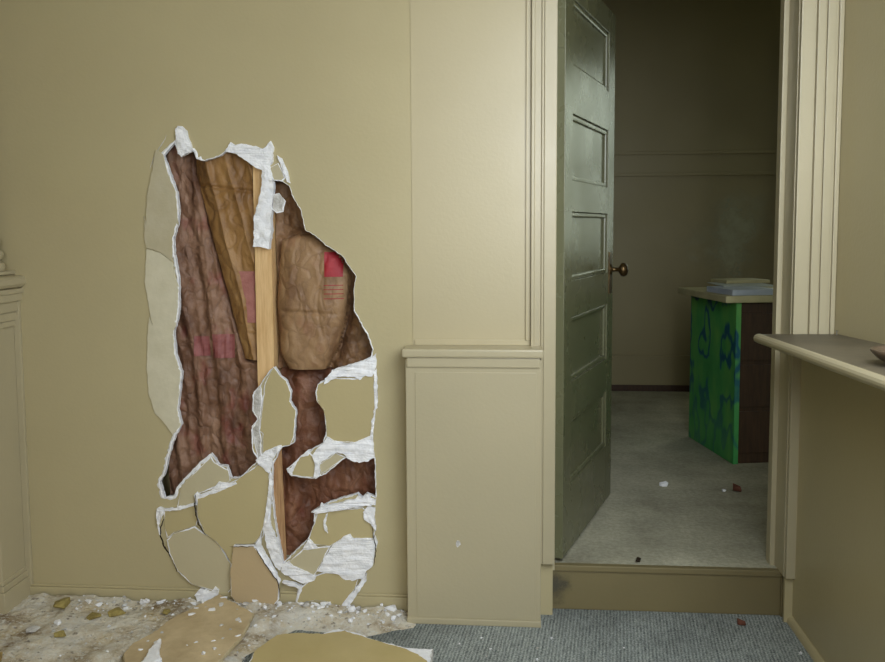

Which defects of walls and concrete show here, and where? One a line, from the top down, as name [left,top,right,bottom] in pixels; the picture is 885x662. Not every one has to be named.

spalling [144,126,378,606]